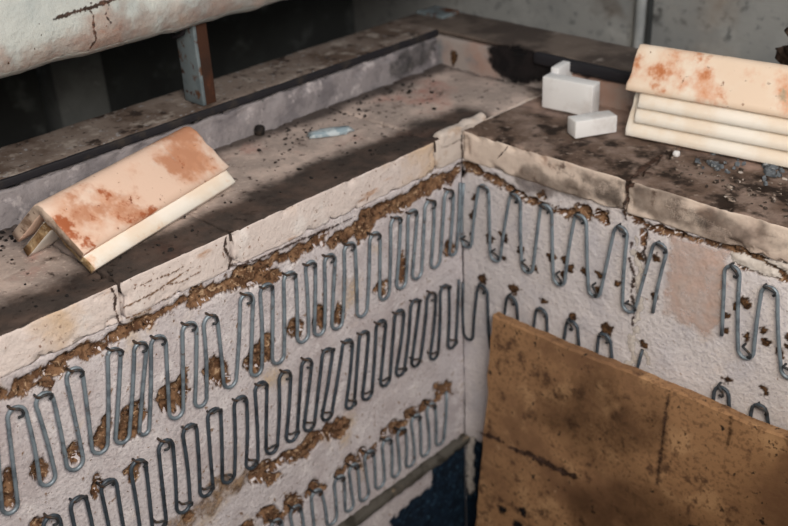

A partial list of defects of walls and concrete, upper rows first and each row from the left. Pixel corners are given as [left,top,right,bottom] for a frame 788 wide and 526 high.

crack [53,0,114,49]
spalling [0,161,610,400]
crack [622,155,663,366]
spalling [625,210,788,283]
spalling [2,467,16,508]
spalling [29,457,49,481]
spalling [90,473,105,500]
spalling [89,399,148,451]
spalling [155,366,191,414]
spalling [168,416,351,526]
spalling [241,379,454,526]
peeling [389,437,483,526]